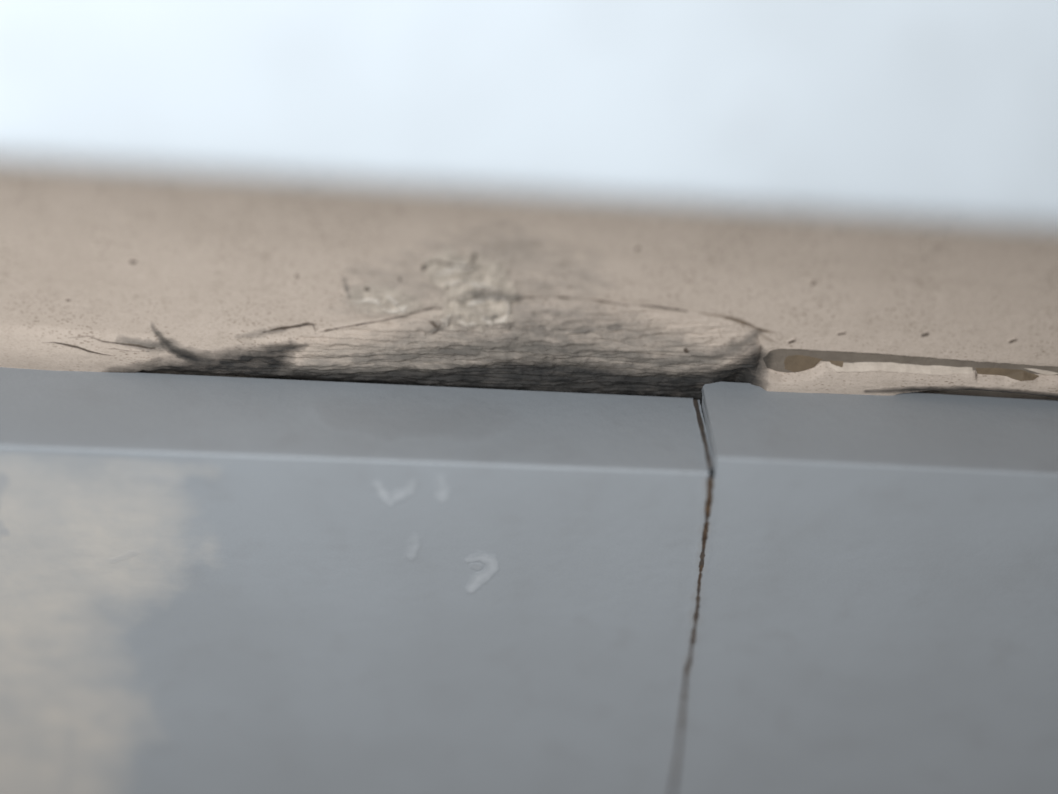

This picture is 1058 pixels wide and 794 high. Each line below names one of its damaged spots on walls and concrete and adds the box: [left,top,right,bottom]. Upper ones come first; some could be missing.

peeling [762,347,1058,382]
crack [691,399,715,478]